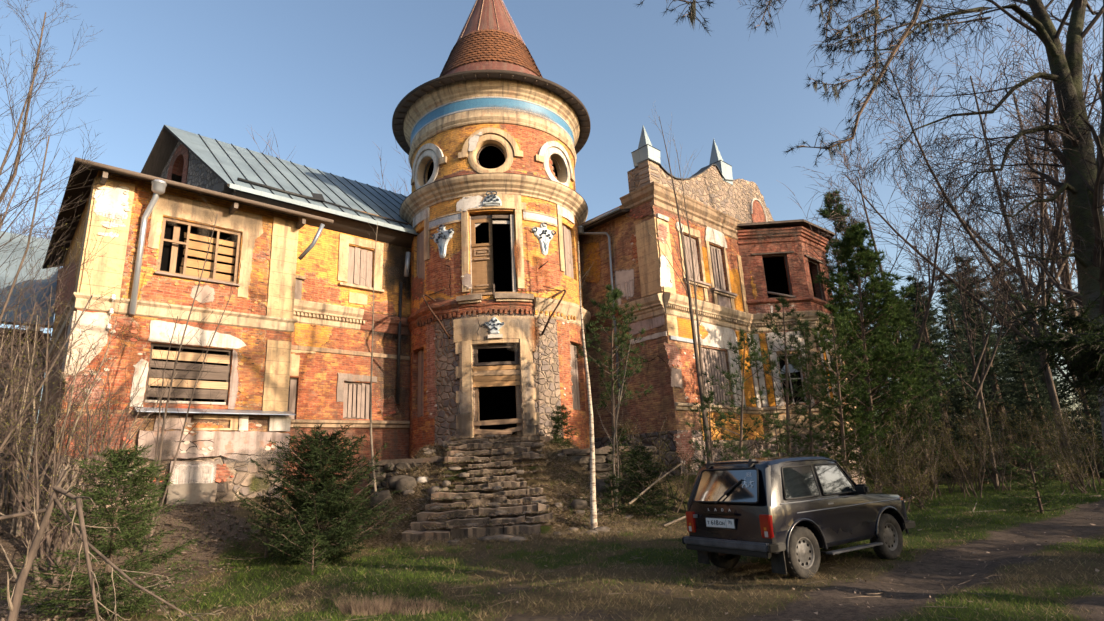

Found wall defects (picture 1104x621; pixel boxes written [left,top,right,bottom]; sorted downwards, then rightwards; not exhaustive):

flaking render [93,186,271,316]
flaking render [54,314,151,458]
flaking render [237,330,267,407]
flaking render [175,422,224,456]
flaking render [215,463,234,501]